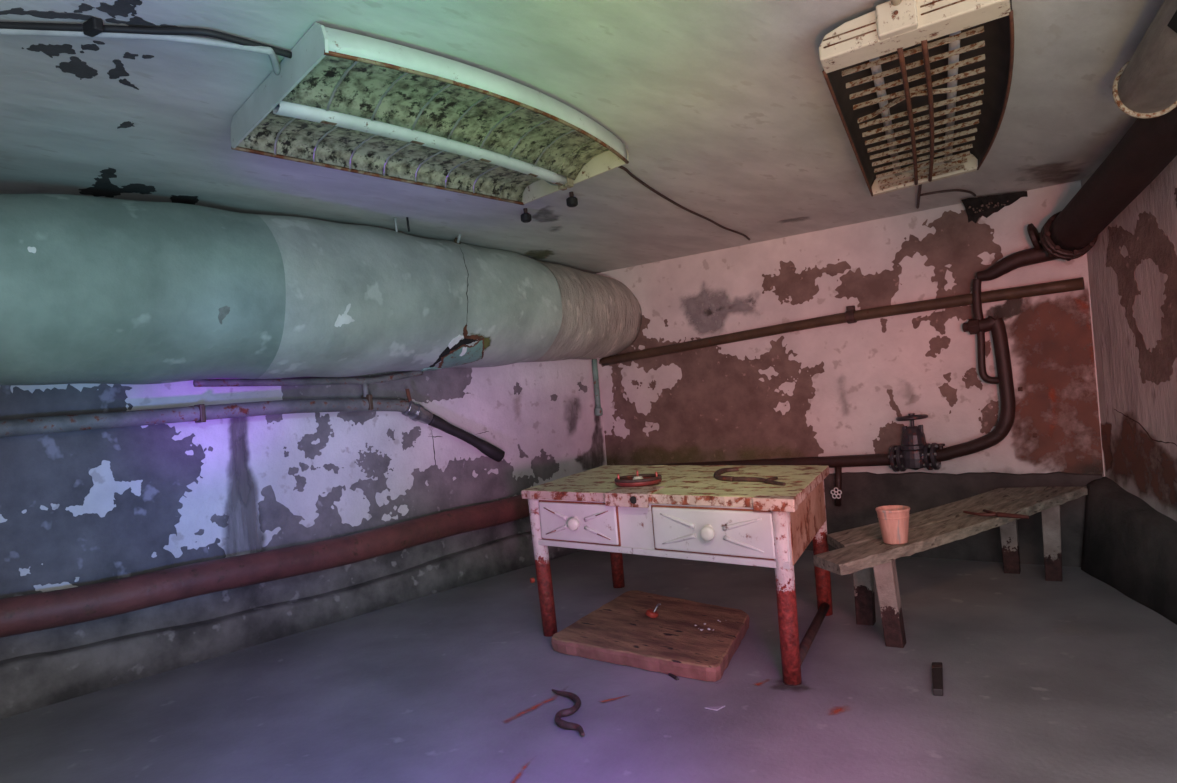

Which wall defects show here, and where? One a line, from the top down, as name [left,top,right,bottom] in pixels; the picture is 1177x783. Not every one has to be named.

peeling [22,40,154,90]
peeling [0,0,178,27]
peeling [762,191,1028,358]
peeling [1106,211,1177,385]
peeling [0,384,133,420]
peeling [0,424,227,599]
water stain [227,417,264,556]
peeling [599,315,825,466]
peeling [872,389,904,454]
peeling [938,367,999,434]